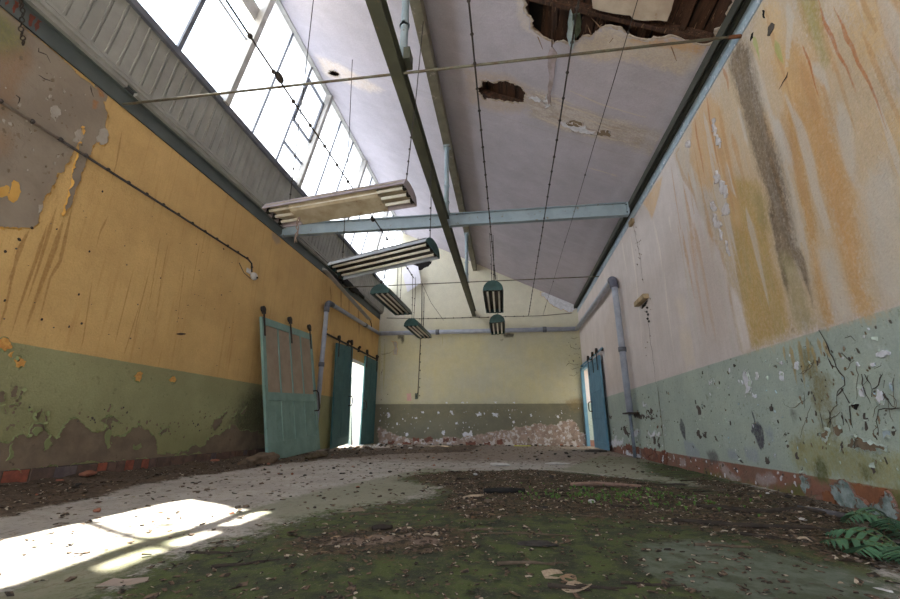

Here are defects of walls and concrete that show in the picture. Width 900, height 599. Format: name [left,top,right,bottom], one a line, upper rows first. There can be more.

damp [853,0,900,85]
flaking render [0,29,109,253]
damp [724,25,900,337]
peeling [0,385,265,483]
flaking render [377,401,587,446]
flaking render [609,371,755,481]
peeling [727,326,891,423]
flaking render [755,383,900,520]
crack [783,331,899,437]